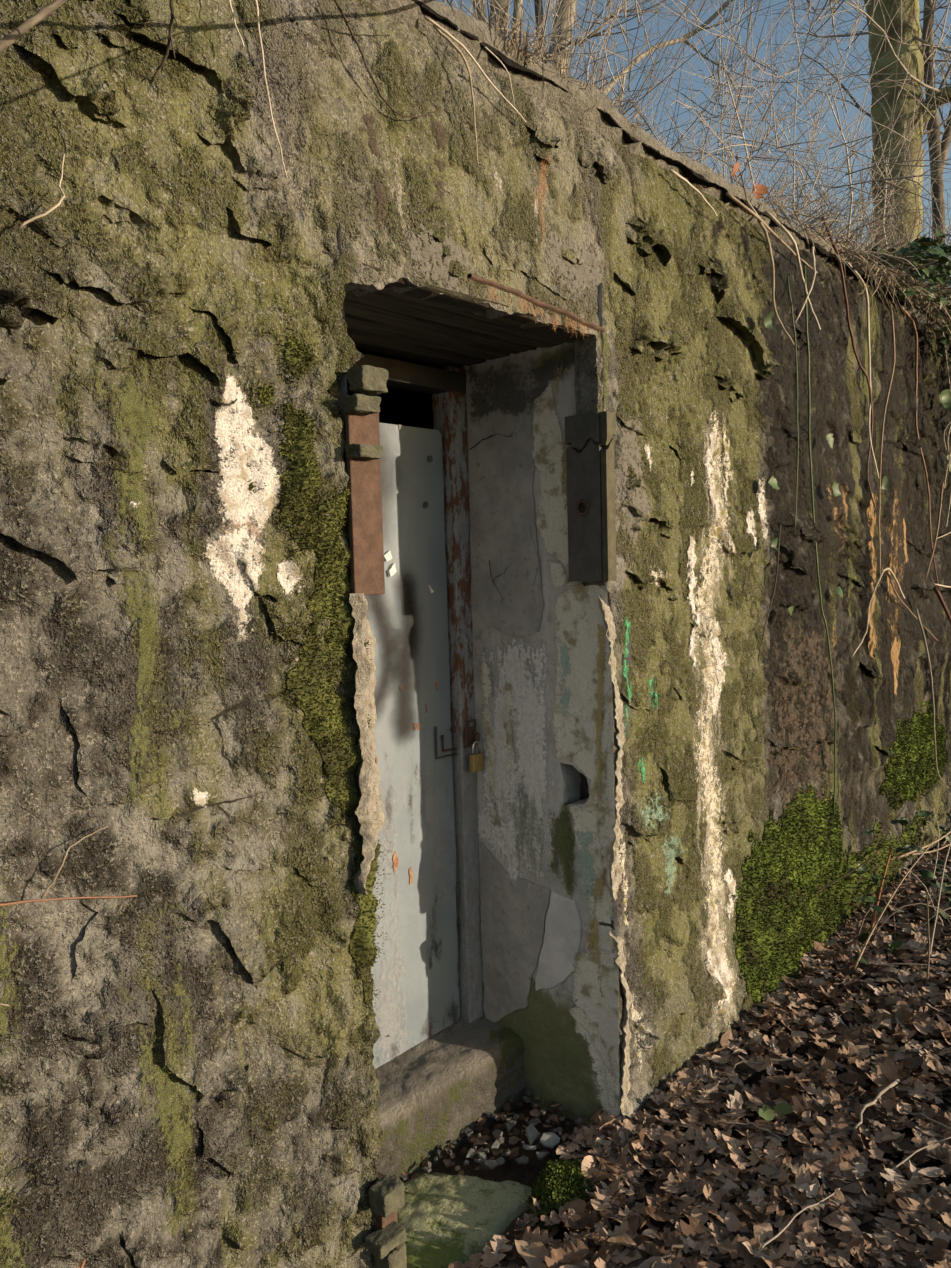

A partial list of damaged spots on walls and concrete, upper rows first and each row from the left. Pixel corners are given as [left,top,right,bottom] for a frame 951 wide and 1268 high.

water stain [203,376,304,640]
peeling [350,619,386,834]
peeling [466,364,706,1022]
peeling [717,790,750,834]
water stain [686,200,853,1038]